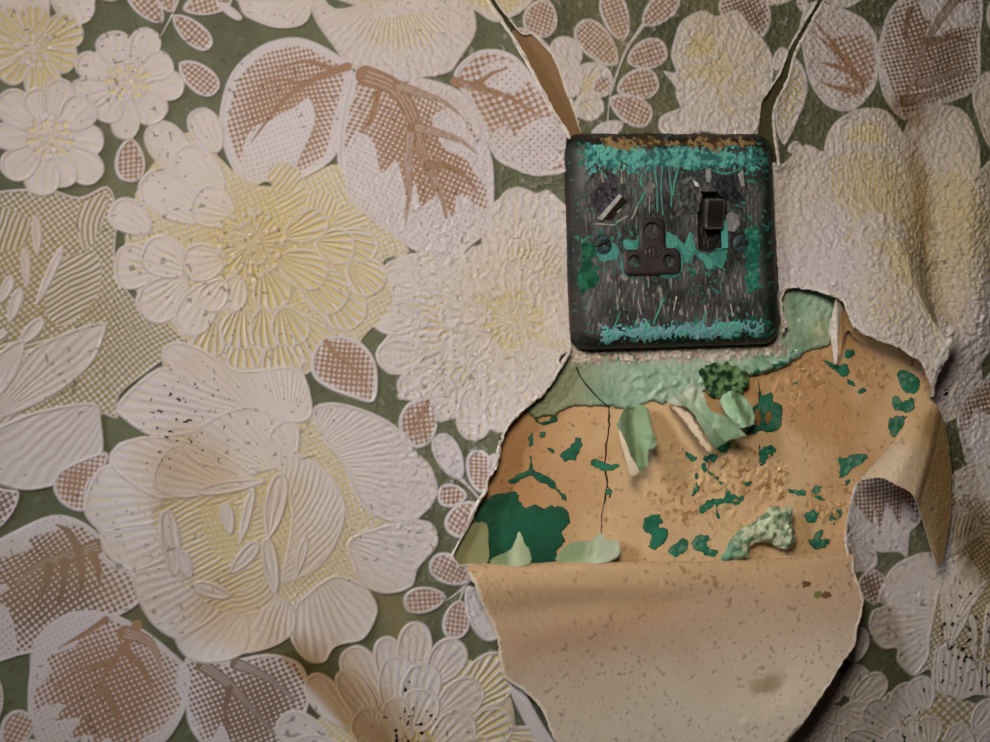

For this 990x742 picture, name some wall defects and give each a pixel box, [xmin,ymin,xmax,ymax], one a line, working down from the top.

peeling [454,522,532,567]
peeling [525,288,893,557]